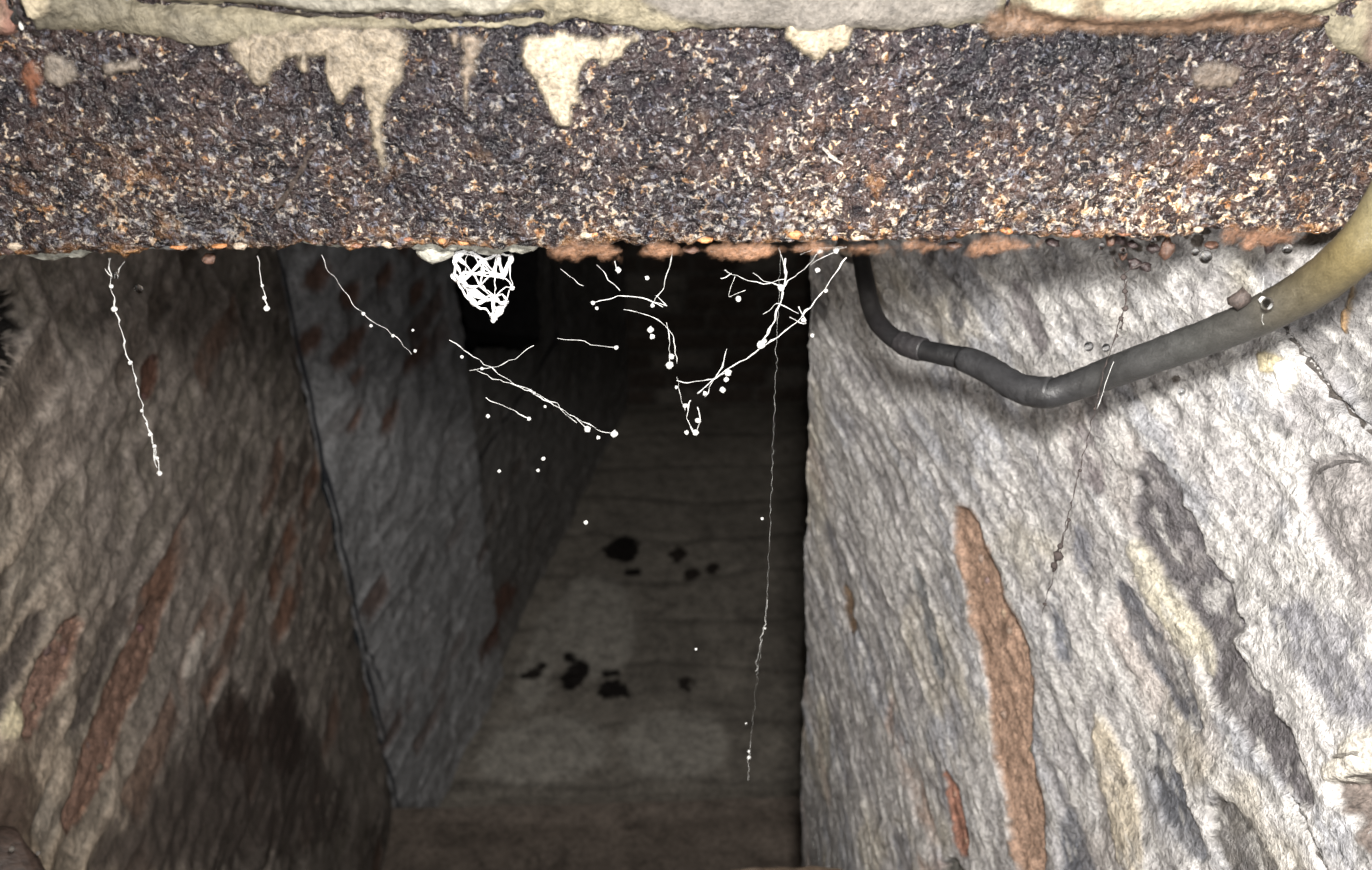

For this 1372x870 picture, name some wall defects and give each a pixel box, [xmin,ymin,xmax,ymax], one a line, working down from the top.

rust [985,0,1321,36]
rust [201,242,247,264]
rust [554,232,619,260]
rust [644,234,774,260]
rust [788,230,866,253]
rust [905,227,1083,256]
rust [1193,219,1294,255]
crack [1283,326,1372,435]
leakage [601,536,641,576]
leakage [668,546,720,581]
leakage [520,662,546,679]
leakage [560,653,630,699]